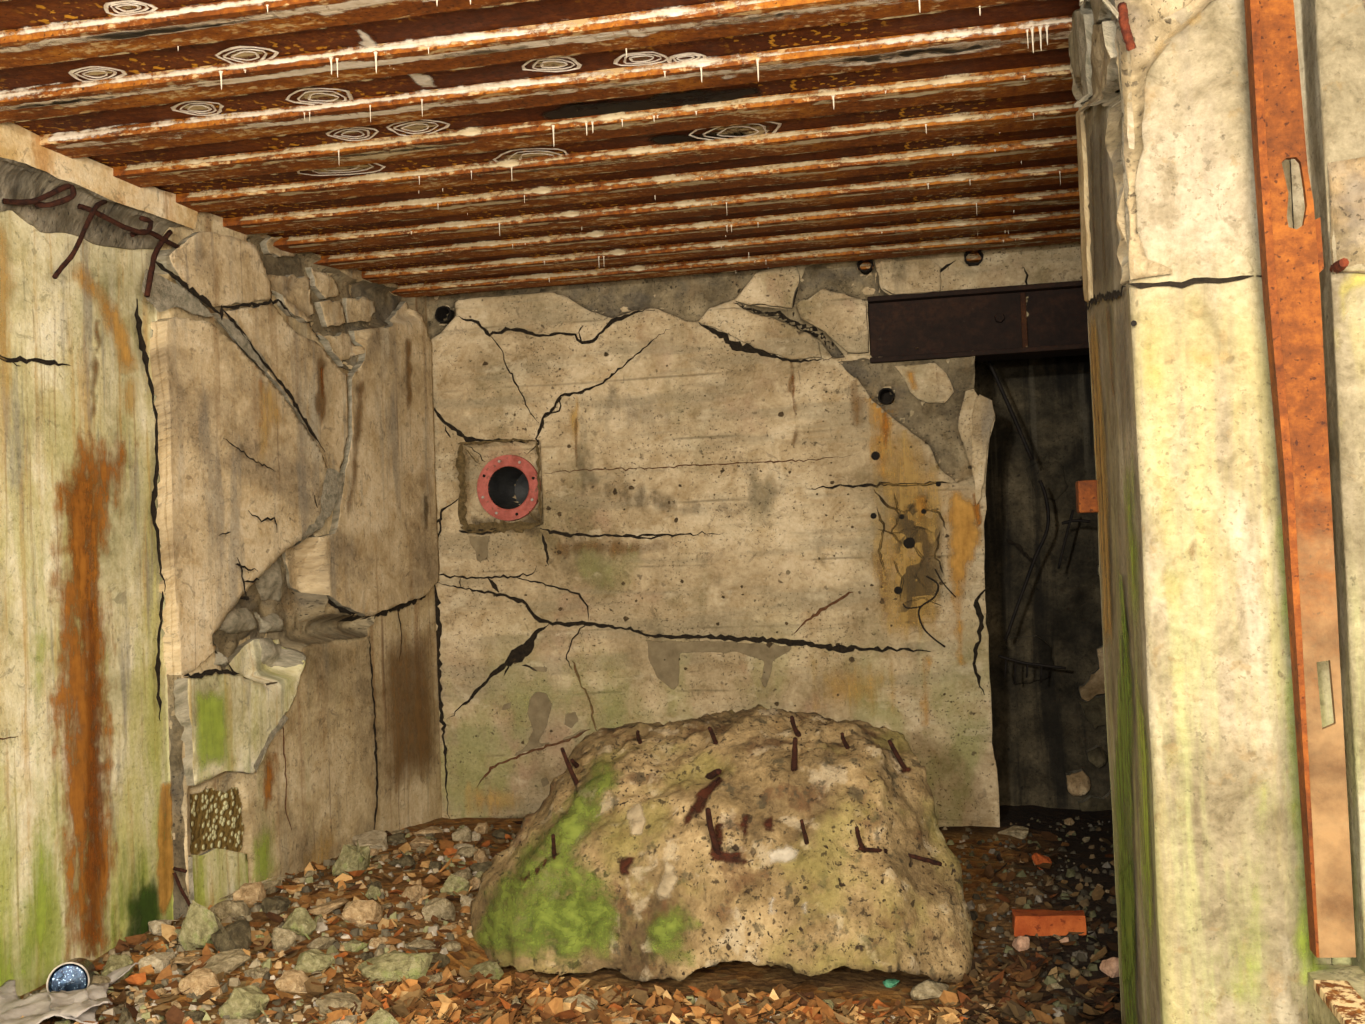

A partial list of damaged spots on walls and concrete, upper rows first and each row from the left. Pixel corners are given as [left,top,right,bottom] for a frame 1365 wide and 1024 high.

corrosion [104,0,158,16]
corrosion [215,46,279,64]
water stain [0,0,1105,294]
corrosion [613,51,707,66]
spalling [1068,0,1213,284]
crack [0,355,70,366]
spalling [247,235,973,486]
crack [1085,275,1262,310]
crack [218,510,277,601]
spalling [212,468,375,685]
crack [328,286,987,829]
corrosion [50,438,126,955]